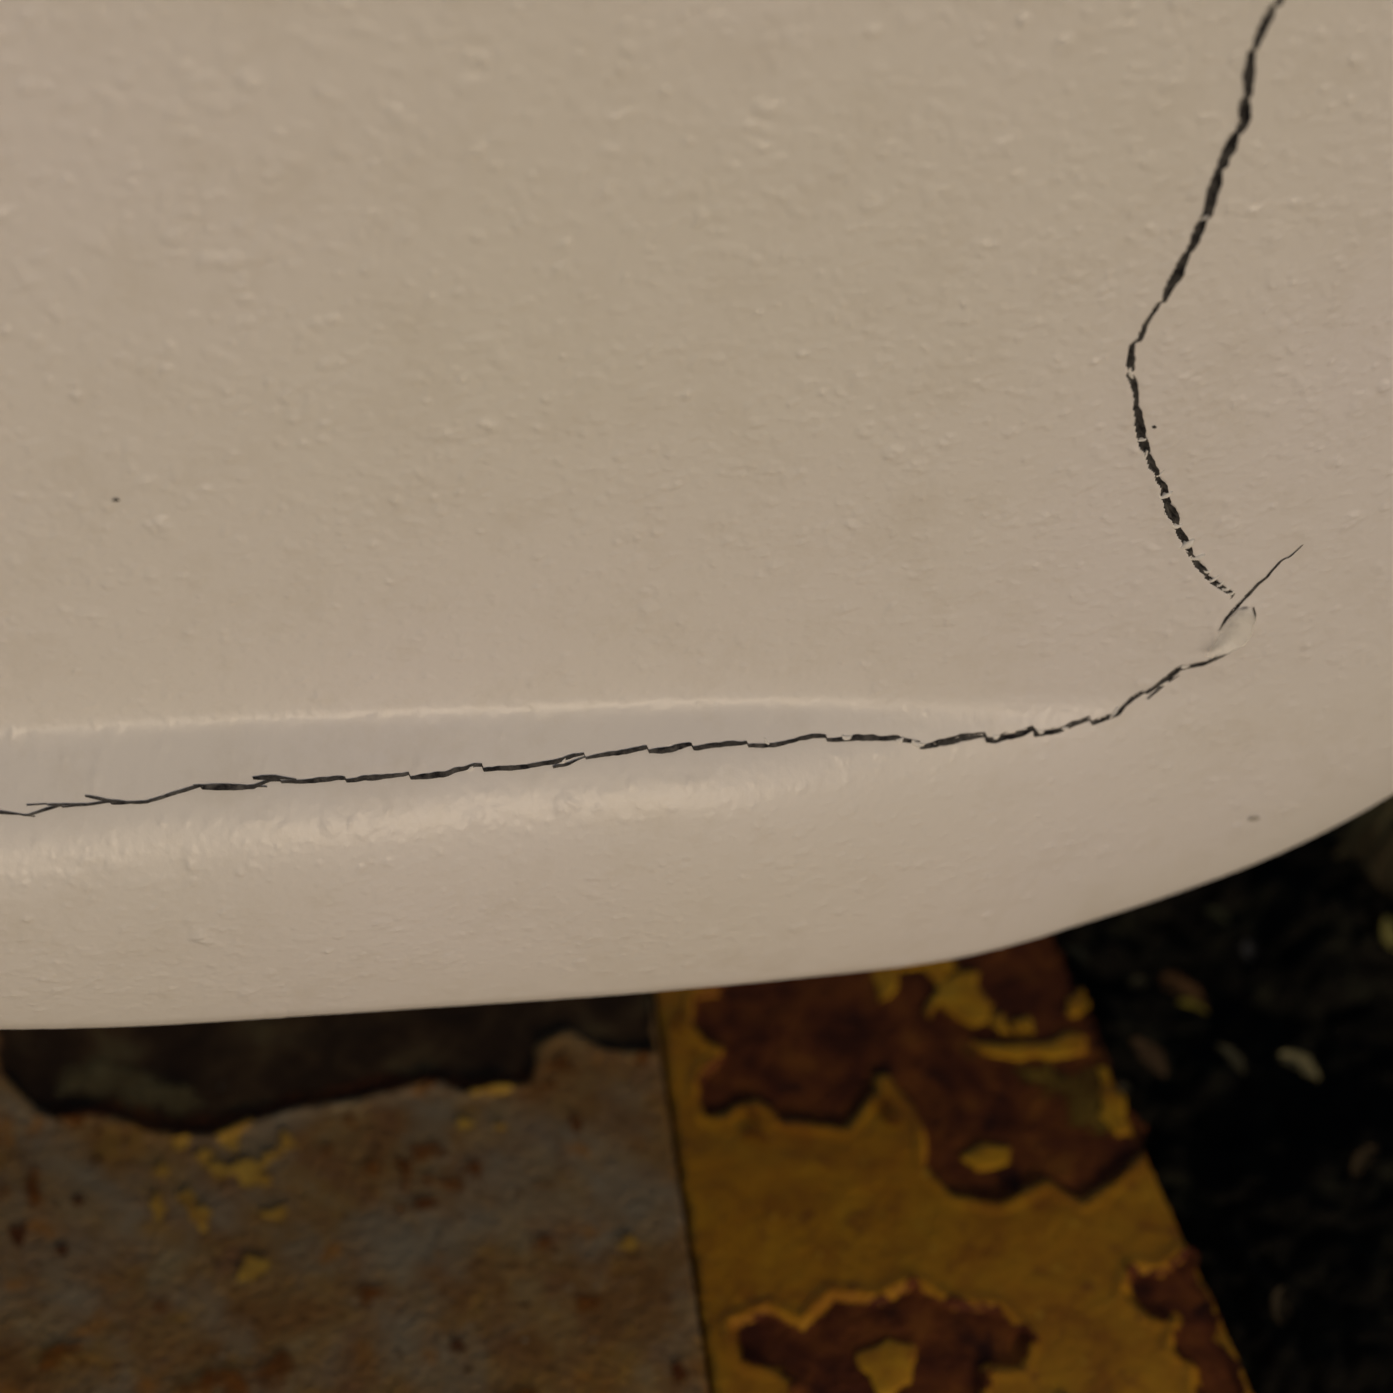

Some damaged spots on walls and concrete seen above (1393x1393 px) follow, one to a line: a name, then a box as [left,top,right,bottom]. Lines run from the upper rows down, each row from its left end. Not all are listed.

crack [0,0,1303,817]
peeling [692,934,1147,1201]
peeling [737,1276,1040,1393]
peeling [1126,1247,1246,1393]